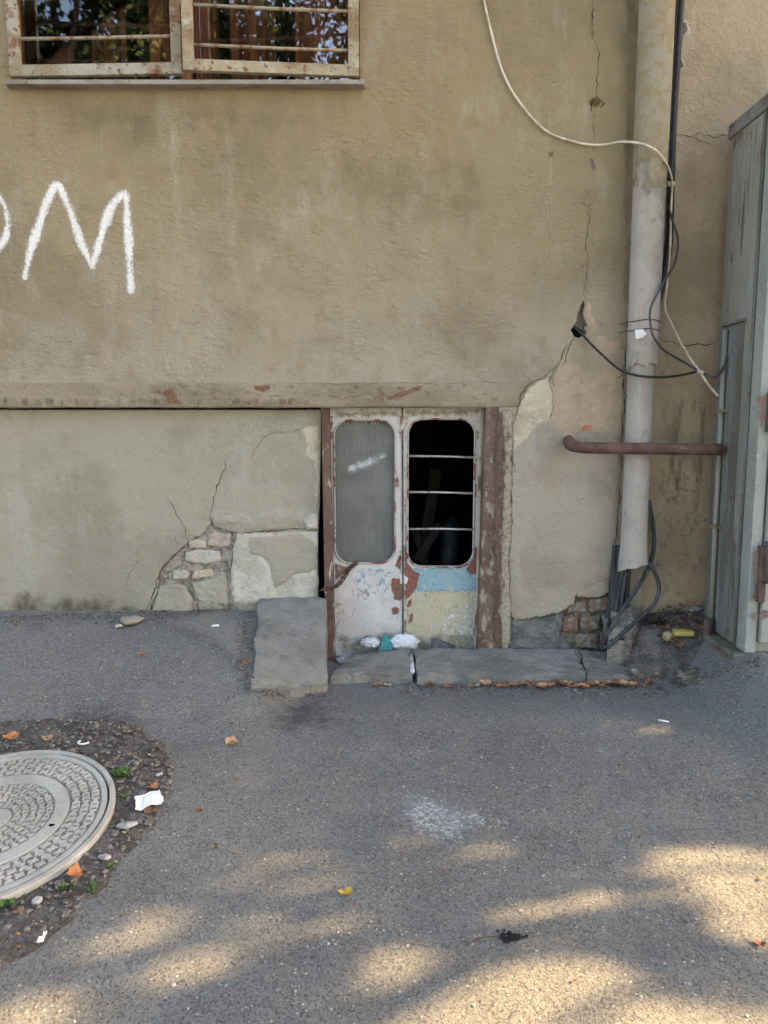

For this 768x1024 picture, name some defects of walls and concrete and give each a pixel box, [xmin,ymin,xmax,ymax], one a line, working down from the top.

crack [590,2,604,160]
crack [581,204,590,298]
crack [124,501,189,609]
peeling [151,425,320,611]
crack [210,462,317,604]
spalling [489,378,641,664]